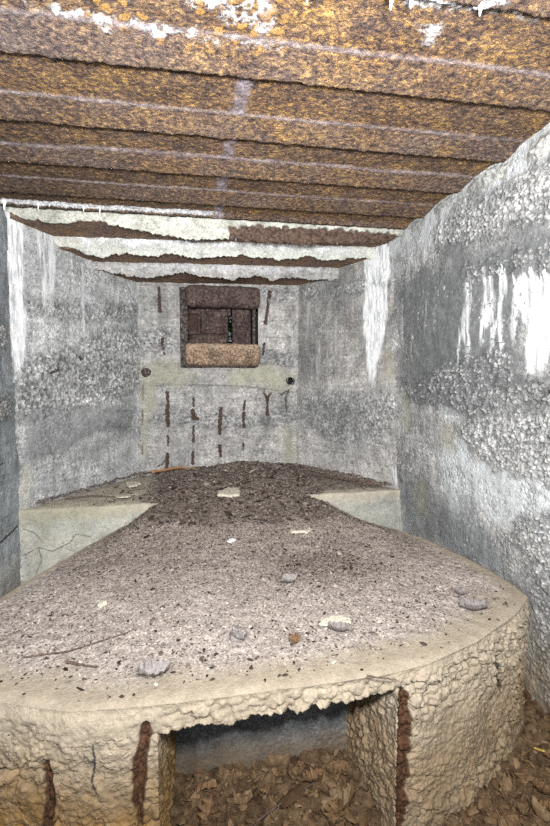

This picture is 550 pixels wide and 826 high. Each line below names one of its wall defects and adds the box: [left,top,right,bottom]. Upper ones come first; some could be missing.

water stain [51,3,110,32]
water stain [130,18,179,38]
water stain [193,0,274,33]
water stain [424,209,444,254]
water stain [67,237,391,387]
water stain [399,230,550,407]